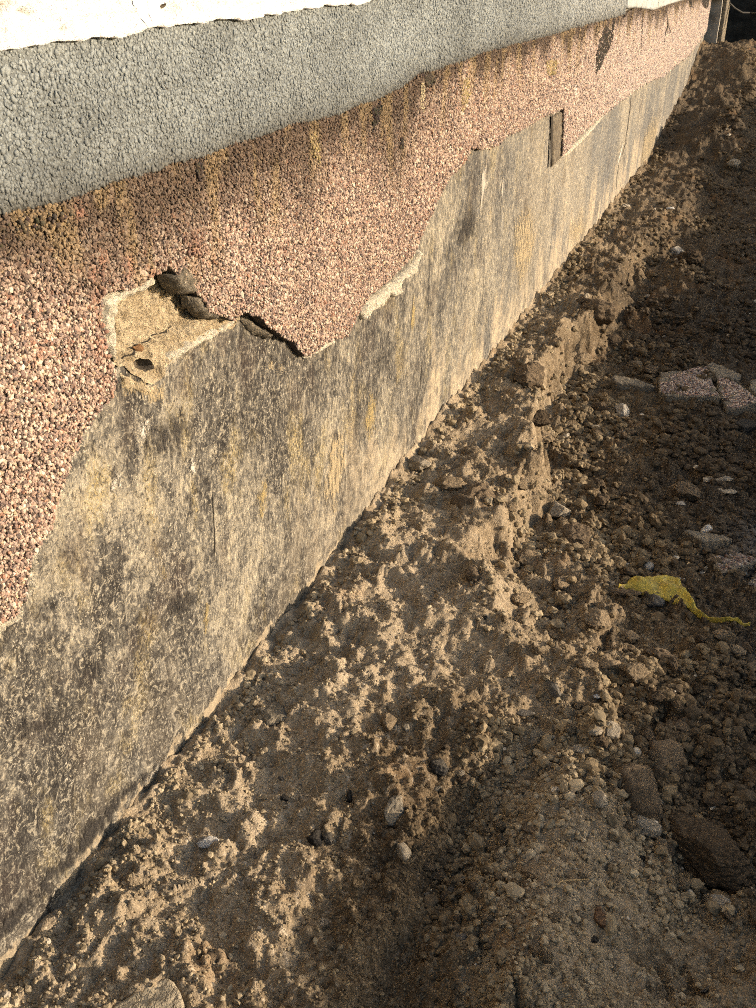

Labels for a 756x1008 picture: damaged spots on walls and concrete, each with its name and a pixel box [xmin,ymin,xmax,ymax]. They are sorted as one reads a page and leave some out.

damp [596,17,615,74]
spalling [359,250,424,320]
spalling [101,267,273,395]
spalling [0,553,39,634]